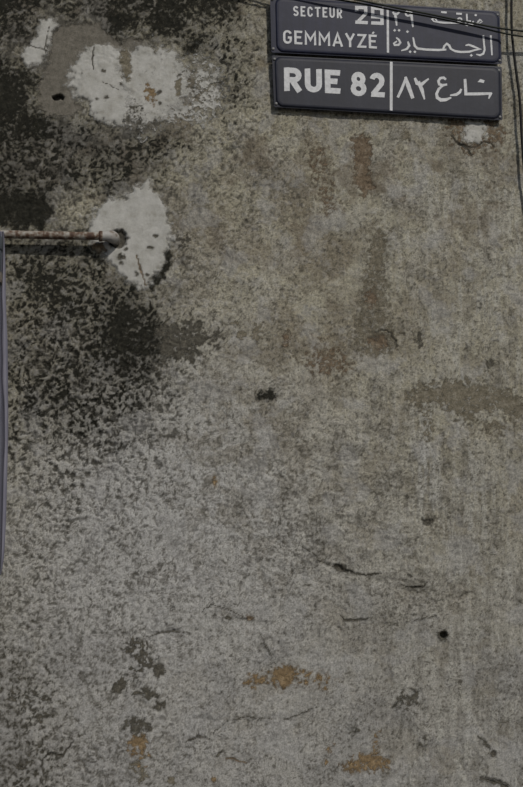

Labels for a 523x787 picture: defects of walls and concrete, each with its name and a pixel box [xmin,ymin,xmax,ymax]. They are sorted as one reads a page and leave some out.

flaking render [37,21,143,117]
leakage [0,0,260,124]
leakage [0,54,263,446]
crack [298,545,379,576]
corrosion [243,663,330,690]
crack [8,742,96,775]
corrosion [123,716,153,784]
corrosion [339,730,391,774]